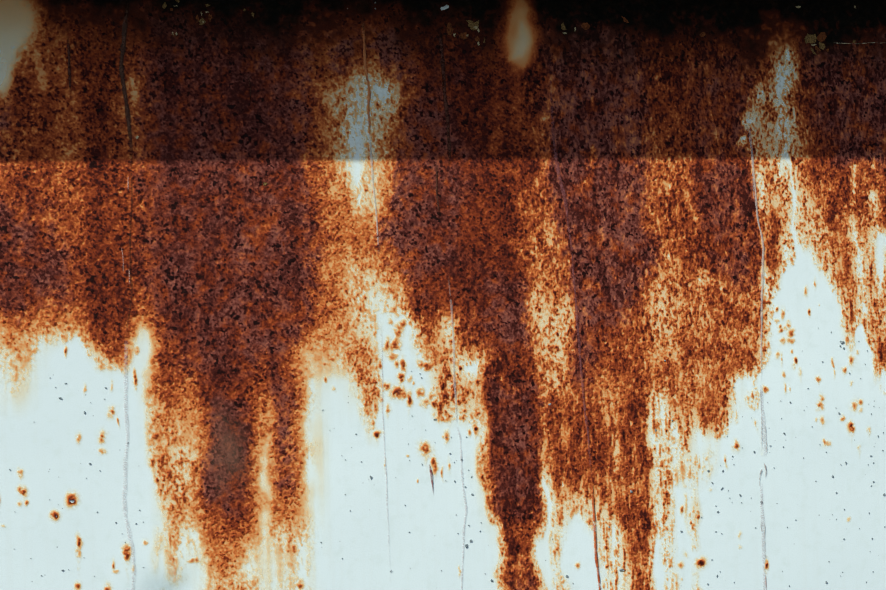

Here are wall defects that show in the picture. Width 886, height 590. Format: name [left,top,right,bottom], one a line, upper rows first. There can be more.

corrosion [0,0,414,590]
corrosion [383,0,886,590]